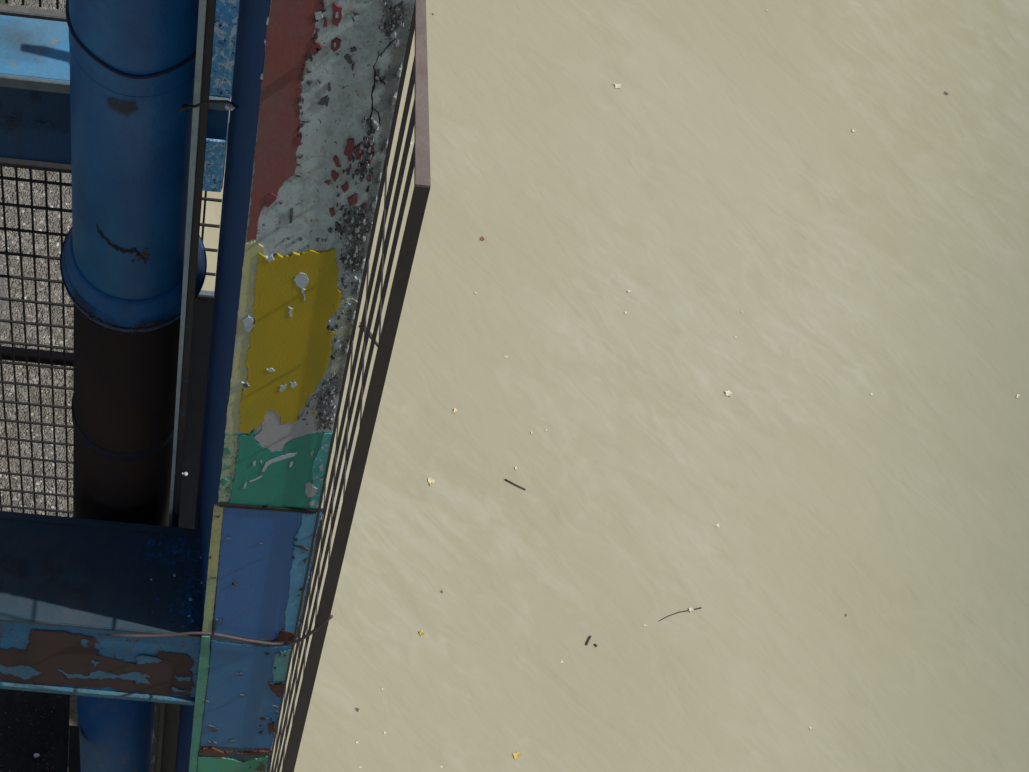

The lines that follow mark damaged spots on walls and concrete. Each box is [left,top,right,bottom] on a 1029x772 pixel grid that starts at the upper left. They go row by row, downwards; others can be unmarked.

rust [109,99,137,114]
peeling [296,0,359,159]
crack [370,39,395,129]
peeling [265,193,293,224]
peeling [287,130,388,293]
peeling [294,273,309,301]
peeling [242,315,254,332]
peeling [327,303,356,360]
peeling [243,383,335,489]
peeling [305,481,317,505]
rust [0,629,195,697]